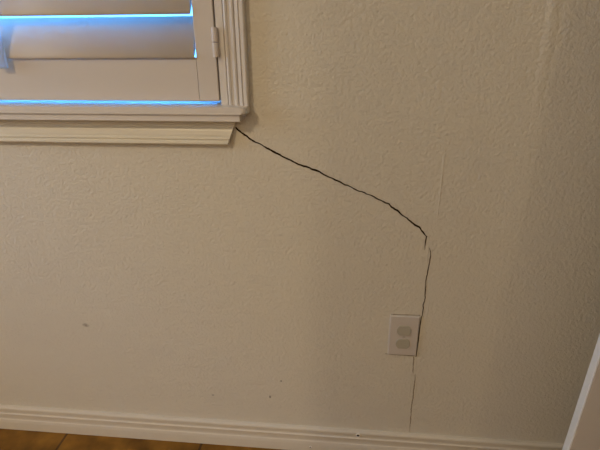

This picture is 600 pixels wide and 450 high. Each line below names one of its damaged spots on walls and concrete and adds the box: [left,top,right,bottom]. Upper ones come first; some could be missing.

crack [235,127,431,424]